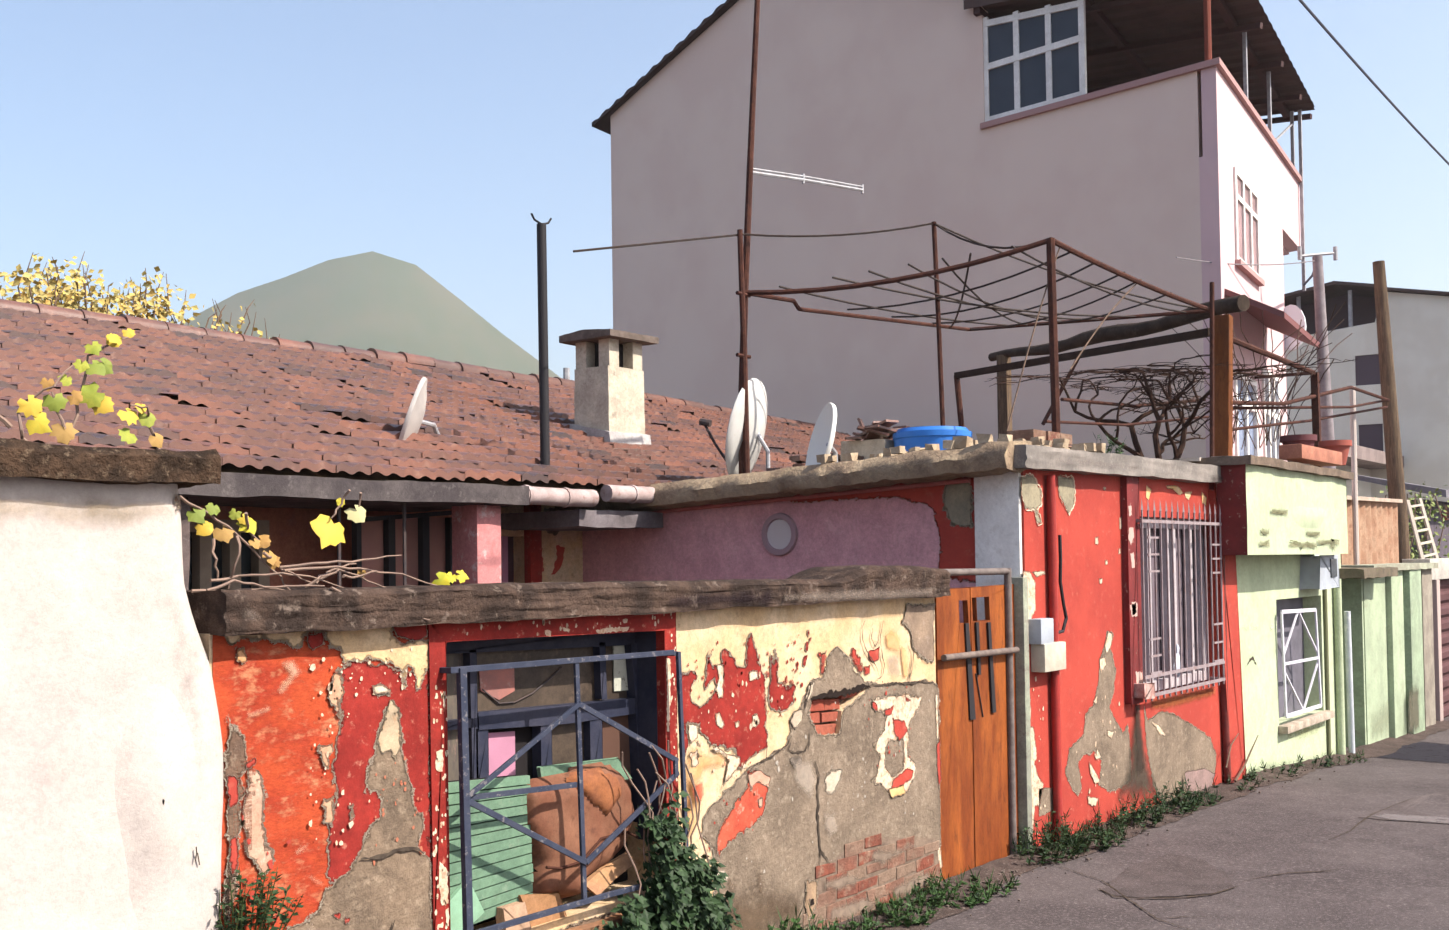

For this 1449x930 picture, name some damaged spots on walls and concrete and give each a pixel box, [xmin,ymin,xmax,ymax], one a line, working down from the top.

spalling [543,440,1076,583]
peeling [533,619,629,637]
peeling [1023,570,1045,619]
spalling [223,625,450,930]
spalling [652,603,943,930]
peeling [1030,677,1053,828]
spalling [1065,631,1217,806]
crack [361,847,424,860]